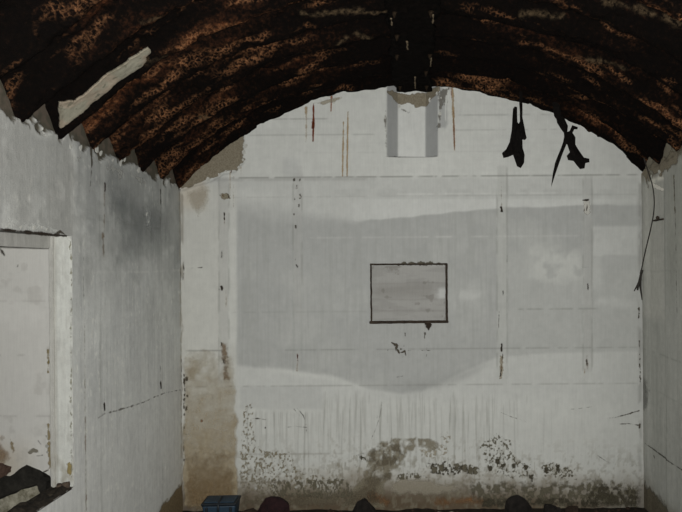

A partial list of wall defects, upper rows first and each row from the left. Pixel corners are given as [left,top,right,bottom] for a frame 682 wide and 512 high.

spalling [58,47,151,128]
spalling [387,86,449,128]
spalling [181,137,248,208]
crack [103,359,188,429]
damp [159,398,238,512]
damp [286,436,450,507]
damp [472,481,668,512]